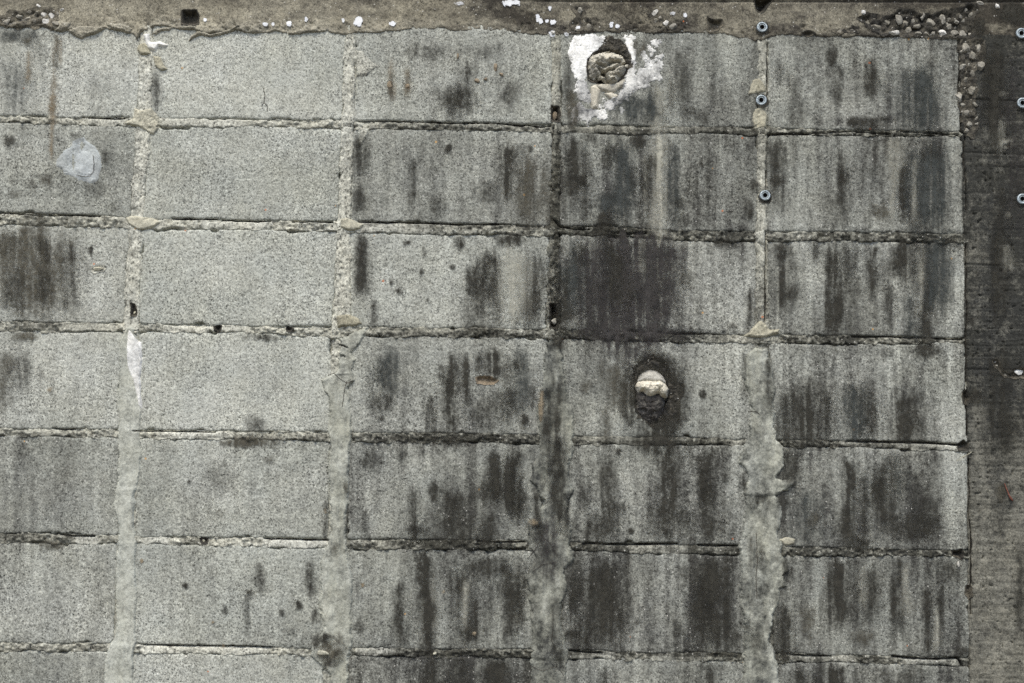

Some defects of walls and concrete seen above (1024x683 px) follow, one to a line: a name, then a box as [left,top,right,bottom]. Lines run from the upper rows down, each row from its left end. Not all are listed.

peeling [550,34,664,127]
water stain [355,235,367,291]
water stain [466,233,546,328]
water stain [552,67,727,548]
water stain [774,241,799,308]
water stain [813,243,877,335]
water stain [886,238,955,359]
spalling [632,356,685,430]
water stain [425,348,569,580]
water stain [839,456,940,550]
water stain [414,552,440,683]
water stain [827,559,908,625]